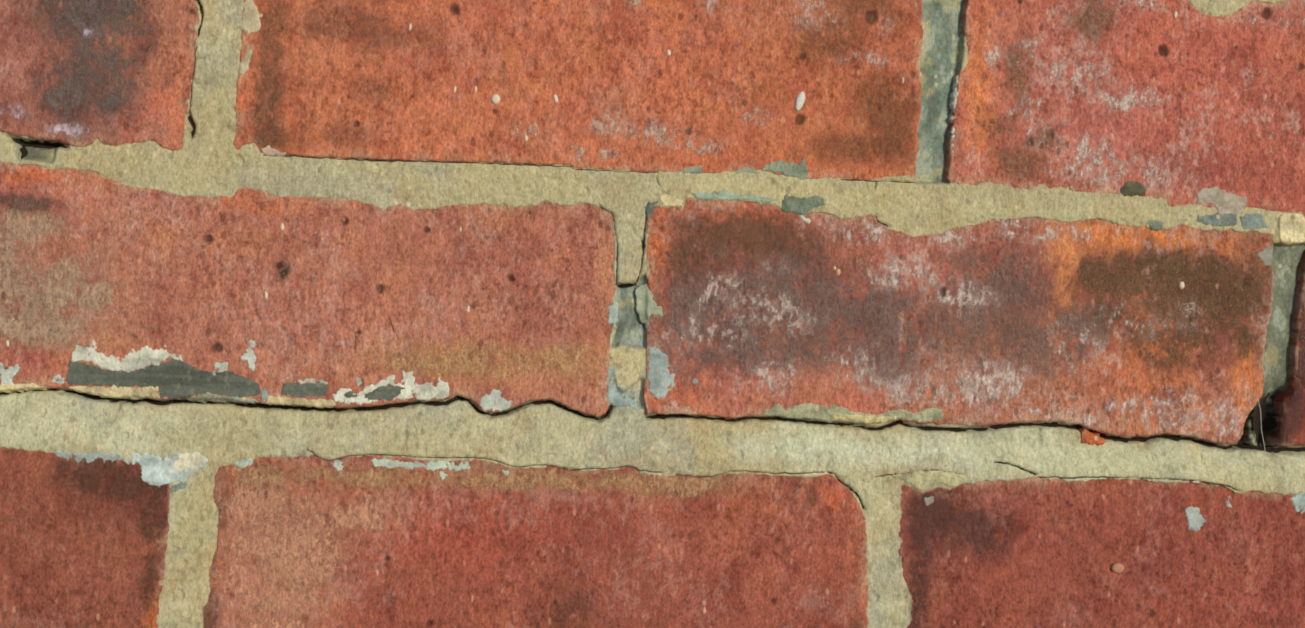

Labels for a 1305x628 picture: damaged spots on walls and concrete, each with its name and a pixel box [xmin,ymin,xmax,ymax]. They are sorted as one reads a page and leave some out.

peeling [607,301,619,329]
peeling [634,282,663,328]
leakage [658,211,1272,406]
peeling [0,339,450,408]
peeling [606,346,675,411]
crack [0,388,610,420]
peeling [478,389,513,413]
crack [646,414,1305,453]
leakage [1024,394,1234,437]
crack [307,449,961,509]
crack [995,461,1238,491]